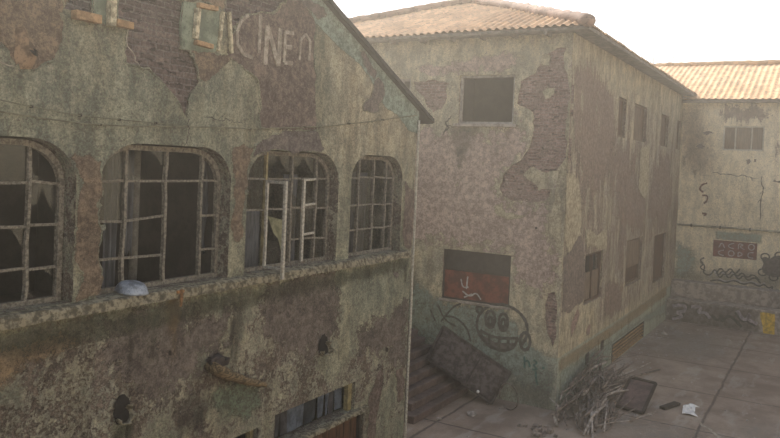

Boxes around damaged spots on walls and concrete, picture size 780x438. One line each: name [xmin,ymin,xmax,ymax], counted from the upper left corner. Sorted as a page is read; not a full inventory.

peeling [117,0,450,157]
spalling [499,46,574,204]
peeling [66,153,106,303]
peeling [253,271,342,363]
peeling [401,181,414,249]
peeling [355,283,553,438]
peeling [544,234,591,347]
crack [712,172,780,229]